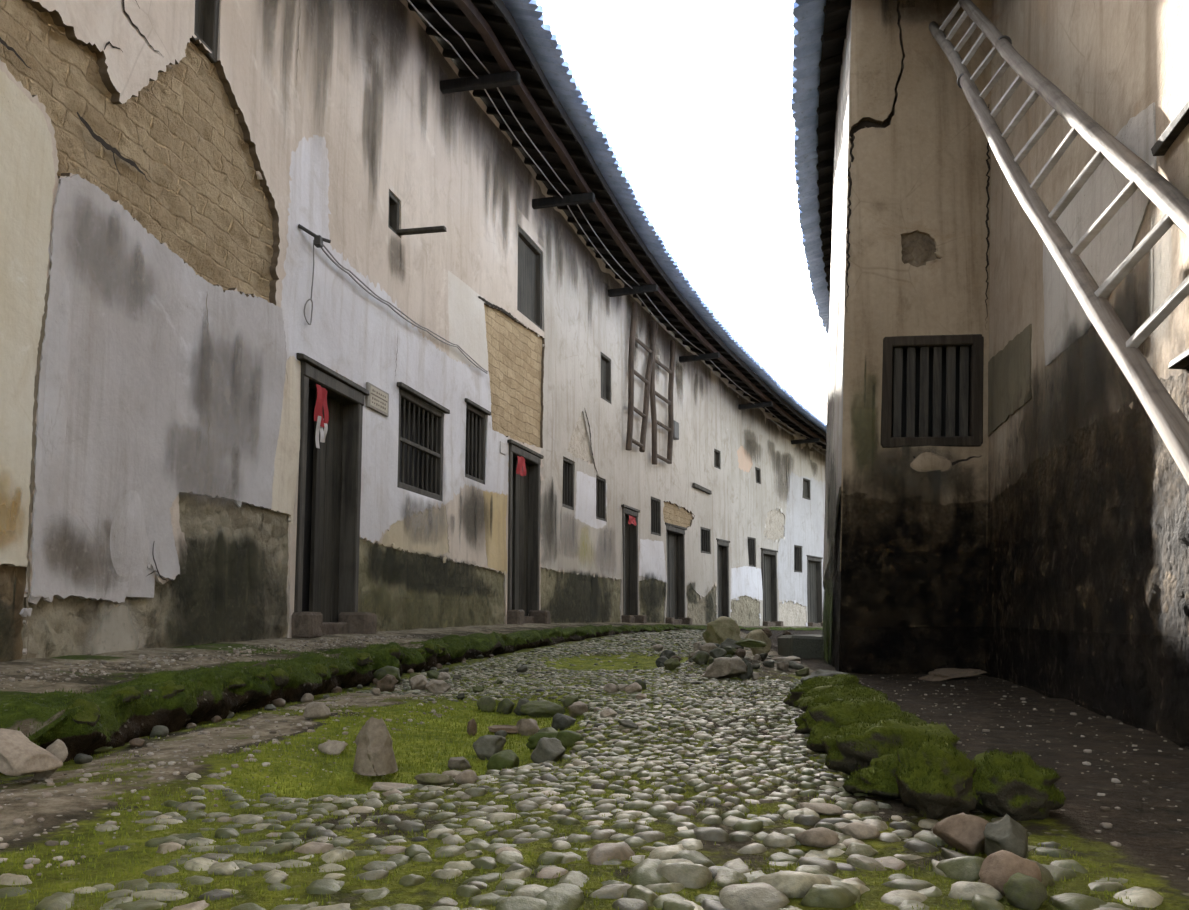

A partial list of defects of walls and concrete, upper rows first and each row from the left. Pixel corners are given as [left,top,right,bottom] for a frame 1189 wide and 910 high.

crack [104,0,162,55]
spalling [0,0,274,303]
crack [845,8,904,308]
spalling [901,231,946,268]
crack [983,142,991,328]
spalling [484,305,544,447]
spalling [0,492,289,662]
leakage [369,546,490,596]
leakage [544,571,611,623]
leakage [641,575,666,623]
leakage [686,583,716,623]
leakage [823,295,1189,749]